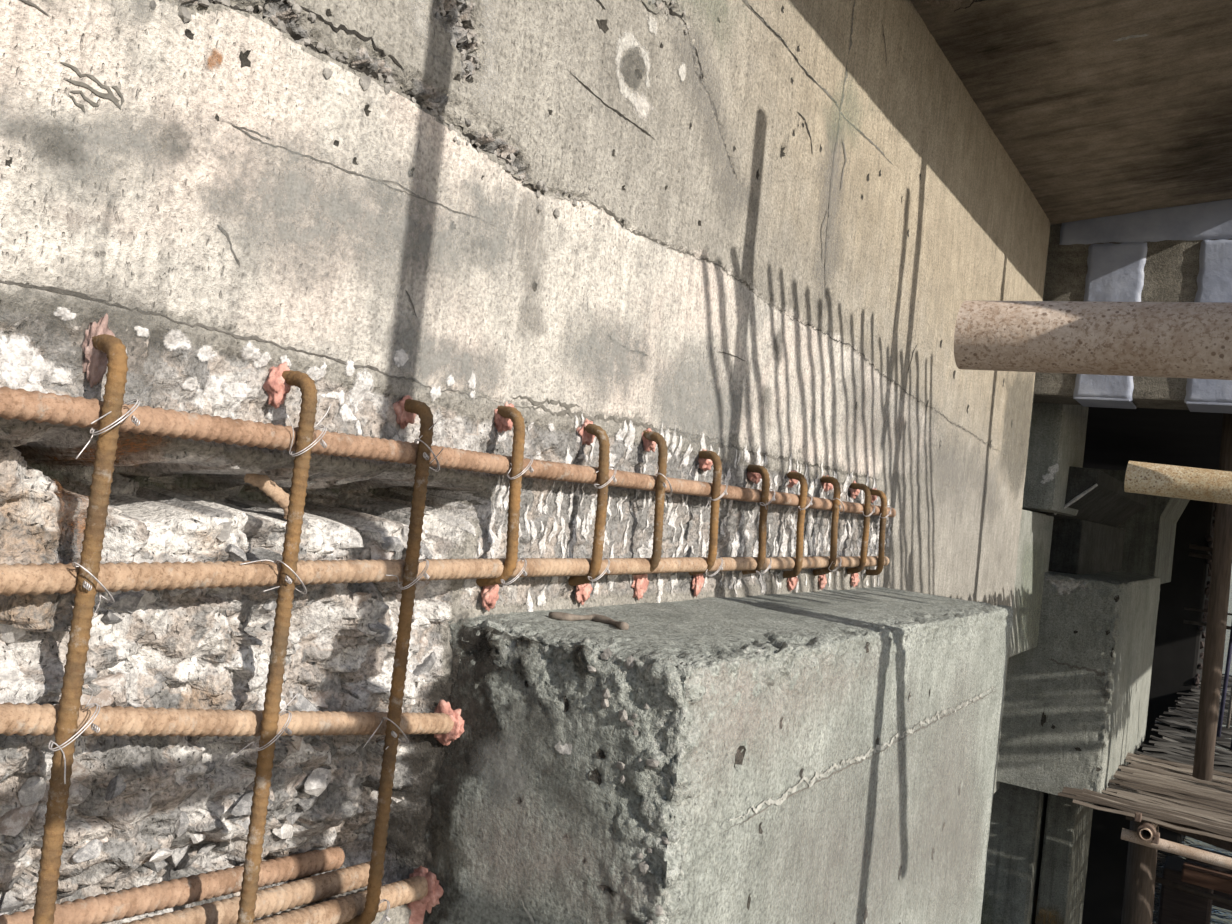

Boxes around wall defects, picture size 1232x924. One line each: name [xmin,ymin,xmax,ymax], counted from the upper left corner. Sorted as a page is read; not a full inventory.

crack [566,68,654,139]
crack [641,0,738,180]
crack [749,5,816,82]
crack [215,118,495,226]
spalling [0,420,99,565]
corrosion [33,444,97,465]
corrosion [114,431,164,465]
spalling [100,437,294,564]
spalling [80,585,279,711]
leakage [373,612,541,924]
leakage [527,698,572,755]
spalling [253,573,1013,924]